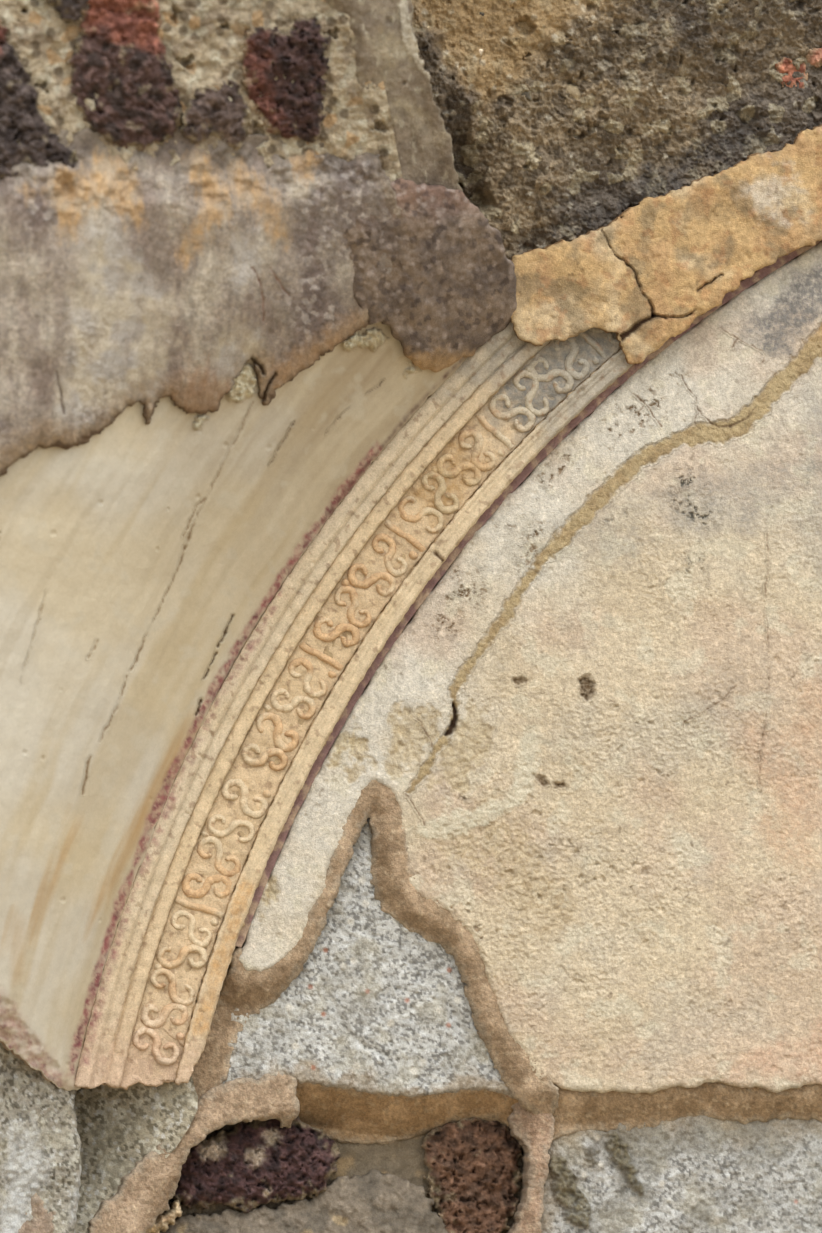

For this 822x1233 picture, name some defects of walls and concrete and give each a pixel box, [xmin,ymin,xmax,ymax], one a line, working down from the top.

crack [404,229,822,827]